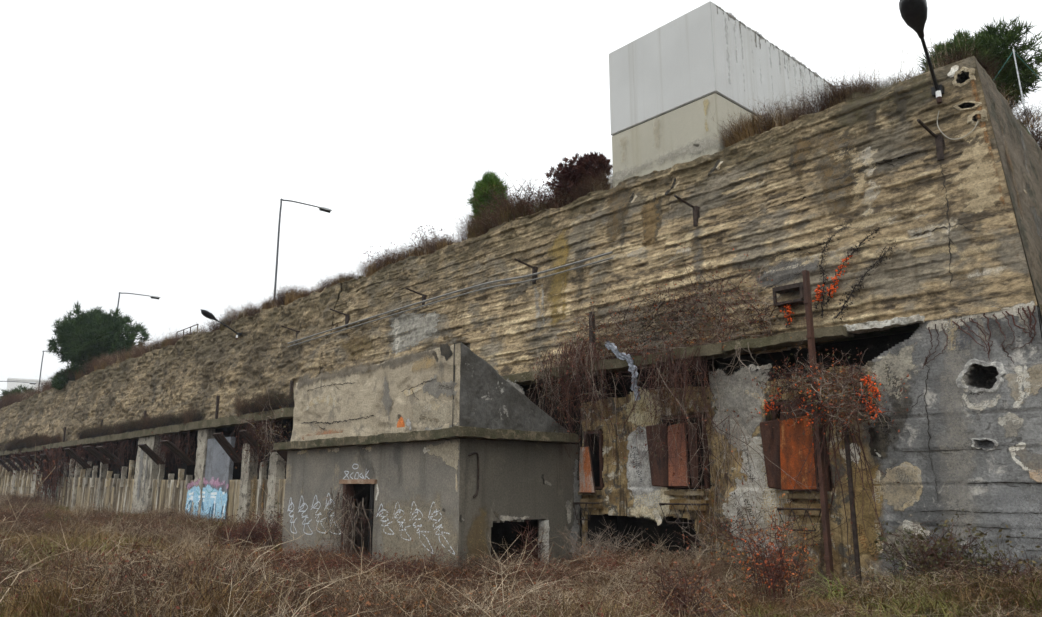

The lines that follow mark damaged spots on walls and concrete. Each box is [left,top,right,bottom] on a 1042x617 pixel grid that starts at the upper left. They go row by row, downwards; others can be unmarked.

water stain [607,138,719,247]
crack [652,152,915,272]
crack [913,163,995,285]
crack [301,415,374,430]
peeling [626,387,662,509]
spalling [956,358,1042,483]